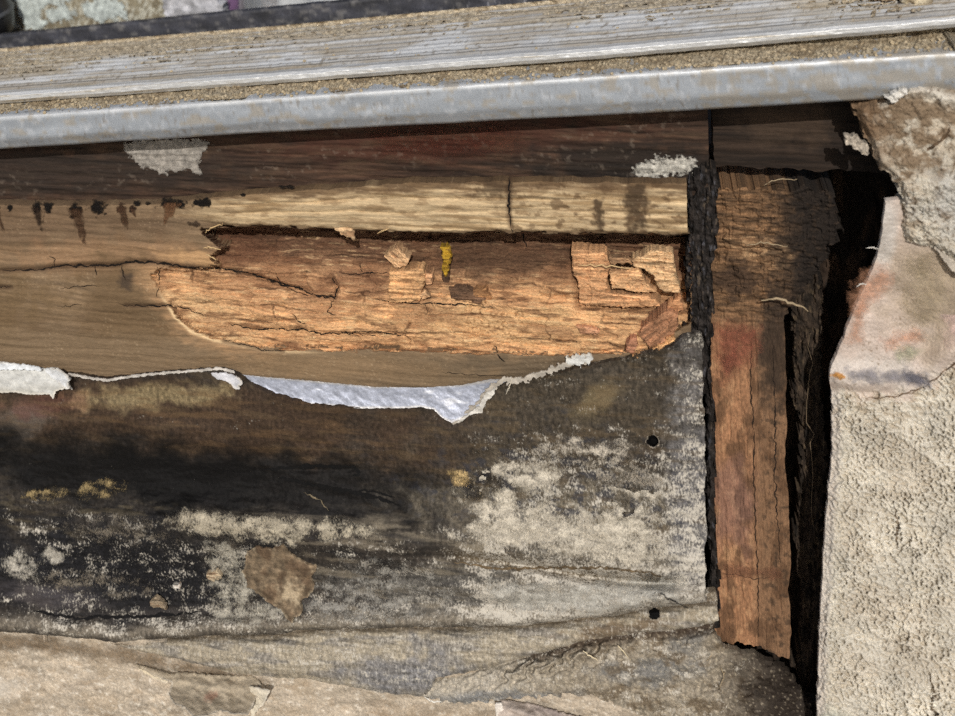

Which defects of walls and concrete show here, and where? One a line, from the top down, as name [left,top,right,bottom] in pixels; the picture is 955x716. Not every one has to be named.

damp [32,200,53,230]
damp [69,197,211,242]
crack [0,256,407,351]
crack [376,299,493,313]
peeling [68,367,243,390]
peeling [452,352,594,425]
damp [448,436,682,616]
damp [4,550,36,580]
damp [43,545,130,597]
damp [179,510,372,625]
peeling [242,544,317,623]
damp [306,559,455,622]